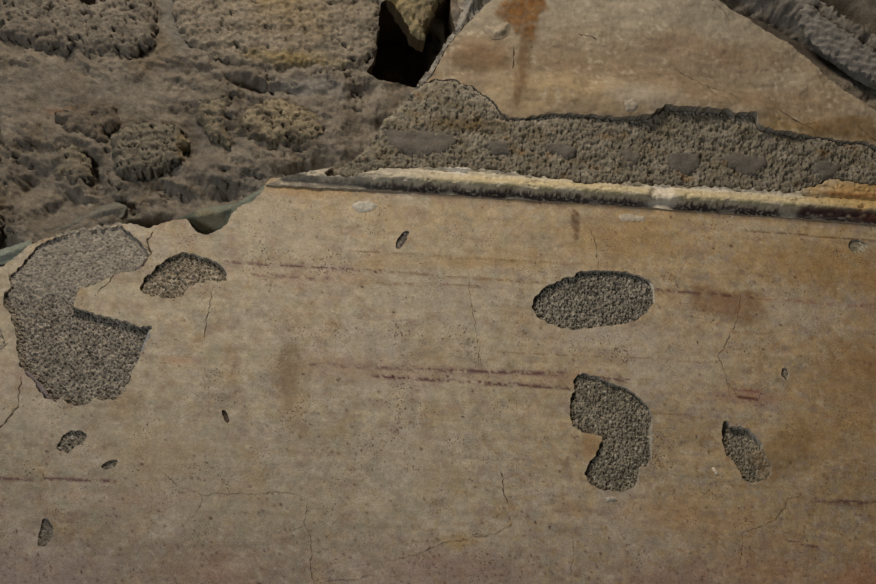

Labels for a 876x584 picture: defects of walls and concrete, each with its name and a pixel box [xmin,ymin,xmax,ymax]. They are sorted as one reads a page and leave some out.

rust [497,0,545,88]
flaking render [0,0,876,406]
flaking render [57,431,87,453]
flaking render [570,374,654,502]
flaking render [721,422,770,485]